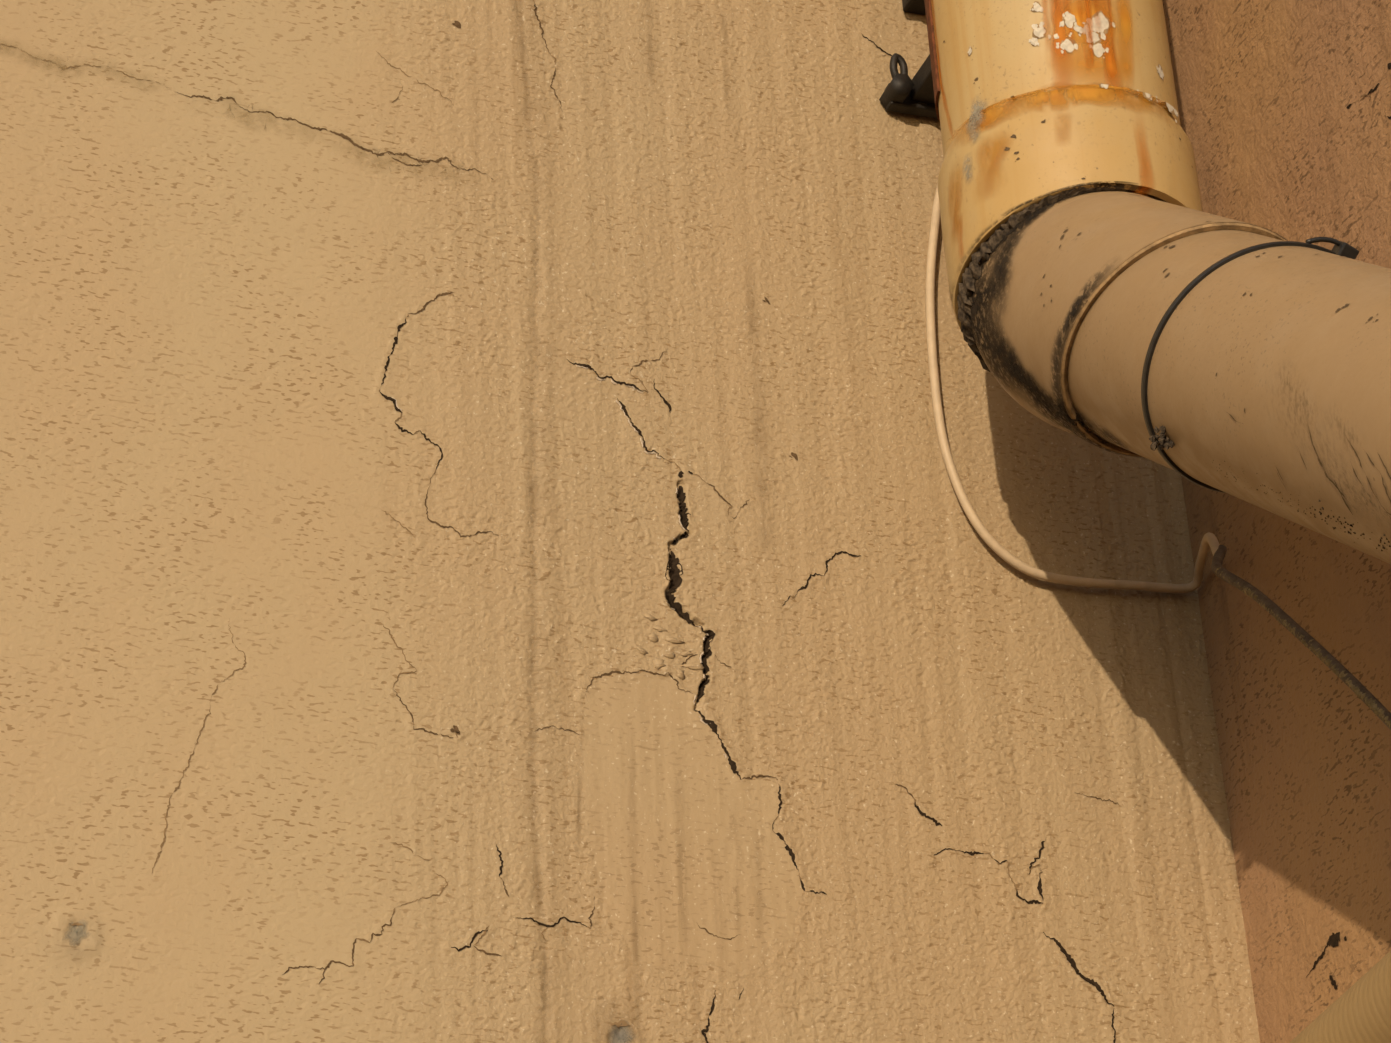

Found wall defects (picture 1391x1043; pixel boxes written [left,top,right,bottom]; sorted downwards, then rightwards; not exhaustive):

crack [0,44,492,179]
rust [970,0,1155,129]
peeling [1029,1,1115,58]
peeling [1137,89,1179,122]
crack [1346,63,1391,119]
crack [379,292,499,537]
crack [383,625,459,738]
crack [567,352,827,895]
crack [783,551,861,605]
crack [284,842,448,984]
crack [451,844,595,956]
crack [896,784,1116,1043]